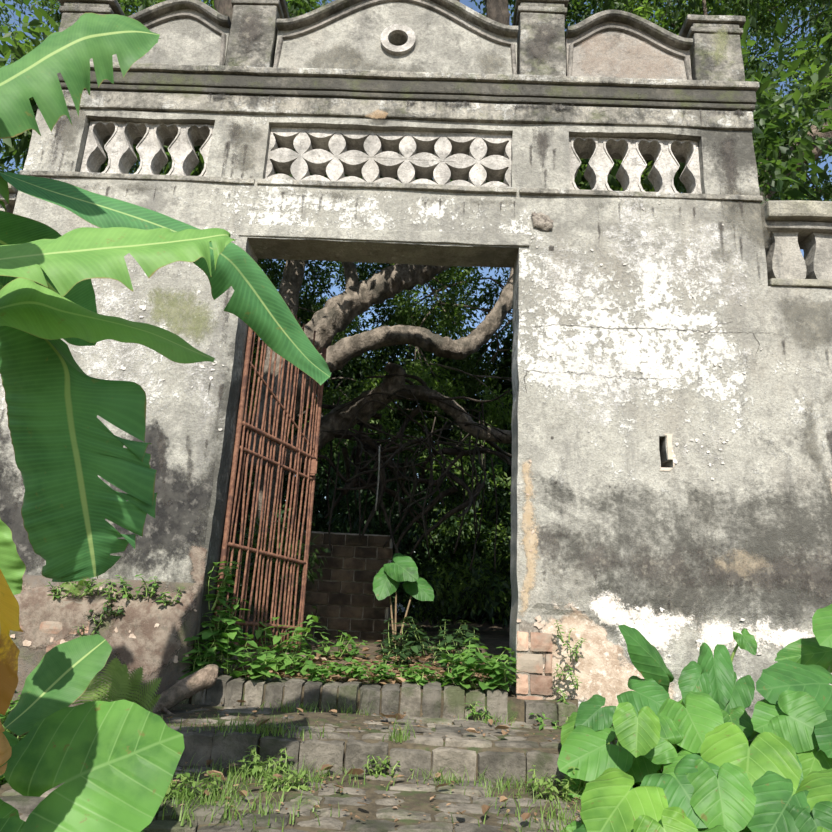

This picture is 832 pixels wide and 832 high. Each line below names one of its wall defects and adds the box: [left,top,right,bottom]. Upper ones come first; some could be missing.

spalling [531,212,609,311]
peeling [608,199,754,305]
leakage [0,410,44,571]
leakage [112,421,215,570]
leakage [537,525,567,559]
spalling [516,459,693,708]
leakage [576,541,832,599]
peeling [696,618,815,655]